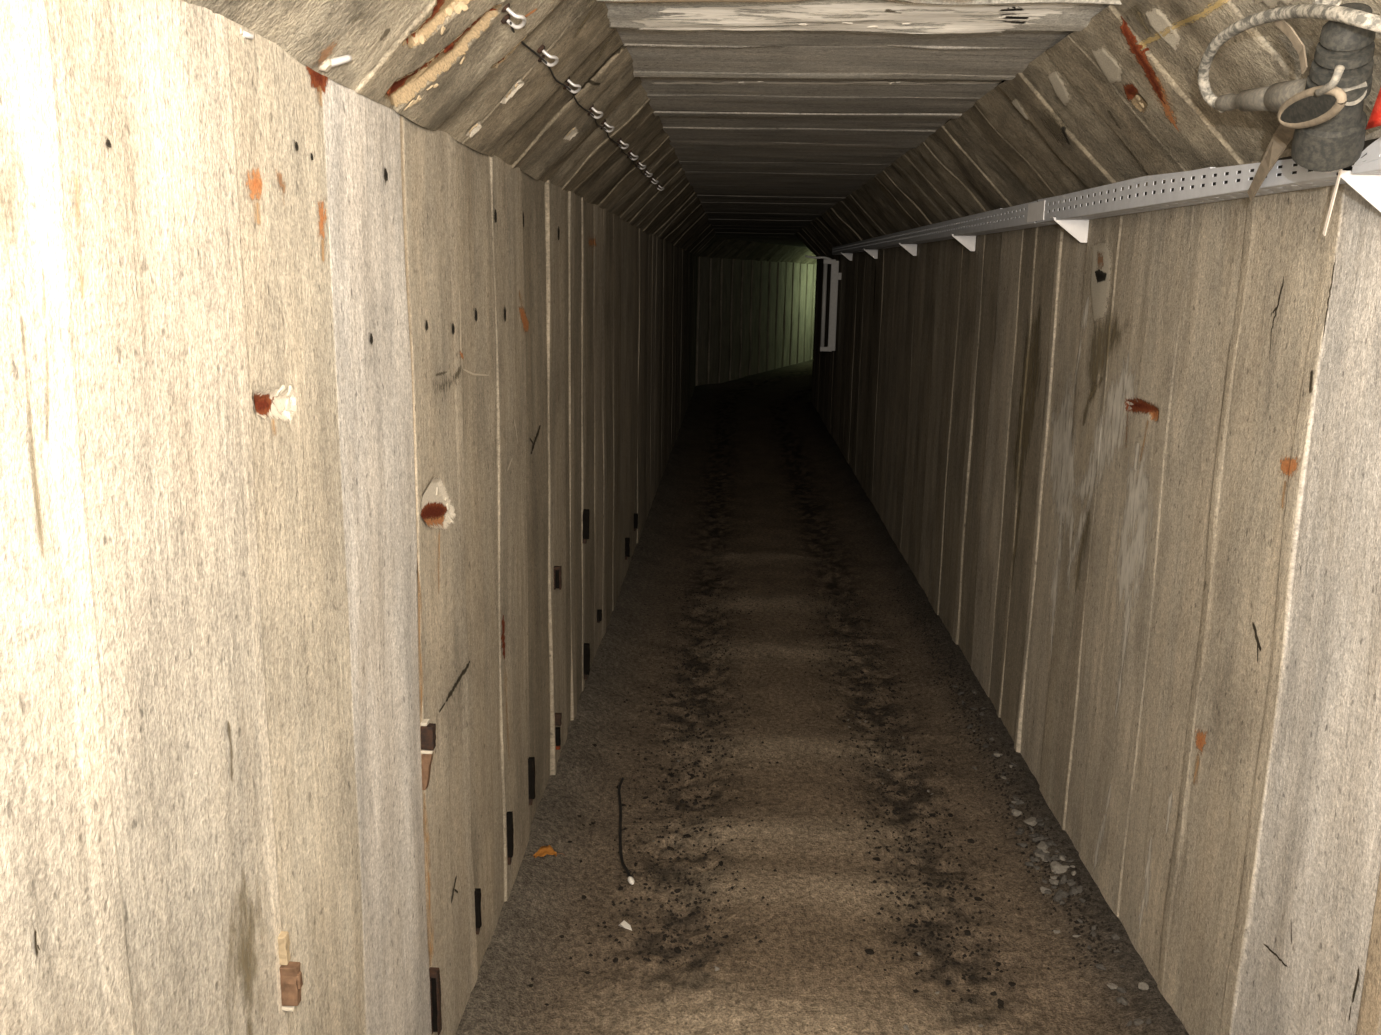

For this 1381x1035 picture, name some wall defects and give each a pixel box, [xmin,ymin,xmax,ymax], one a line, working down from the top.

spalling [385,0,502,111]
rust [246,168,286,224]
spalling [252,385,297,434]
rust [1125,398,1159,460]
rust [1280,456,1298,508]
spalling [420,476,456,589]